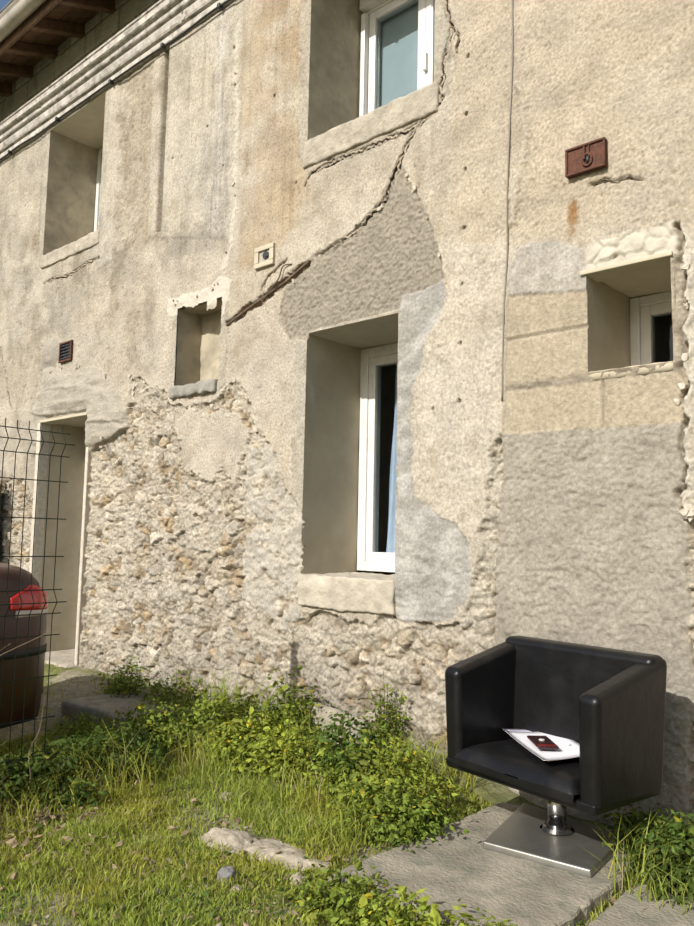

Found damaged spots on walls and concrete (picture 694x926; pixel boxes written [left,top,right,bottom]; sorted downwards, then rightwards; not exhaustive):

flaking render [280,165,444,340]
crack [305,0,460,259]
flaking render [81,375,504,755]
flaking render [679,508,694,664]